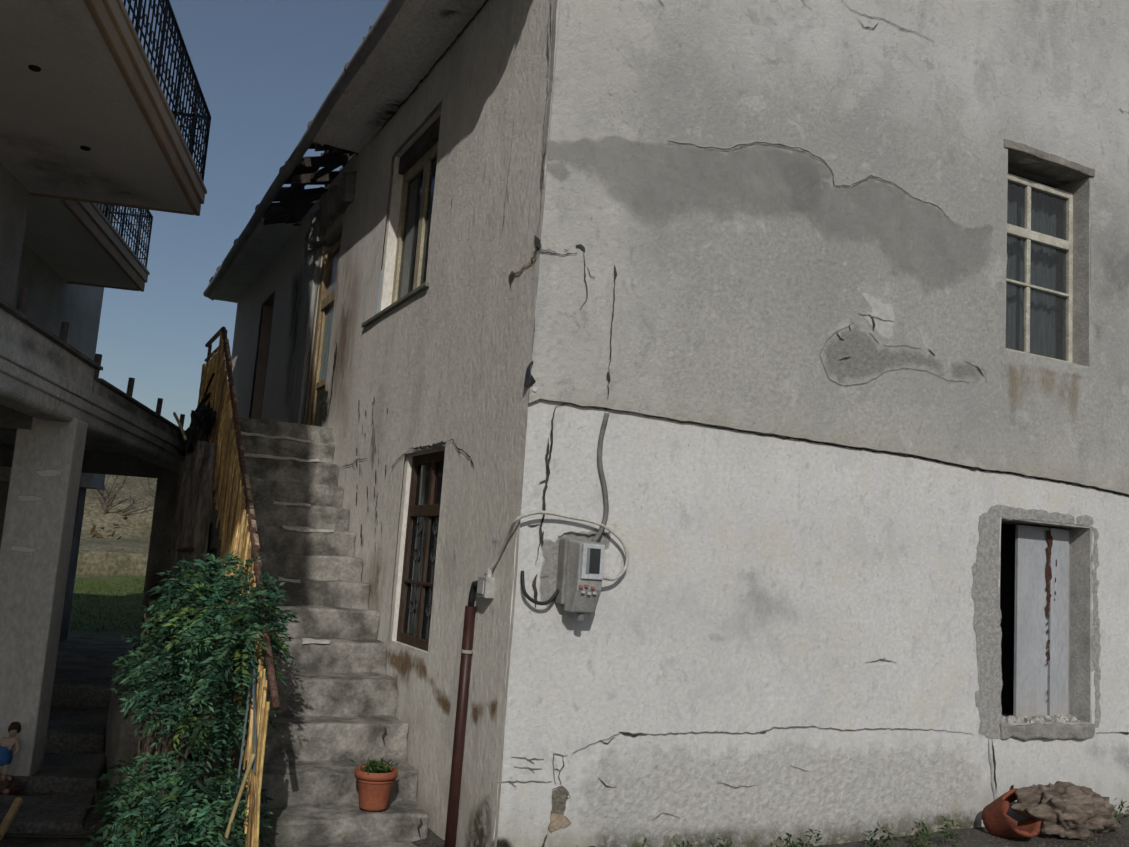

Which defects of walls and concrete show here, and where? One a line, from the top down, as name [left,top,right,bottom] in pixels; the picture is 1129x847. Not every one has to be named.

crack [372,0,488,140]
spalling [668,140,949,218]
crack [502,0,1129,608]
spalling [820,322,987,386]
crack [341,439,474,471]
rust [1046,530,1057,665]
water stain [388,653,426,681]
water stain [437,691,450,711]
crack [495,726,974,786]
spalling [548,786,571,833]
spalling [585,749,972,838]